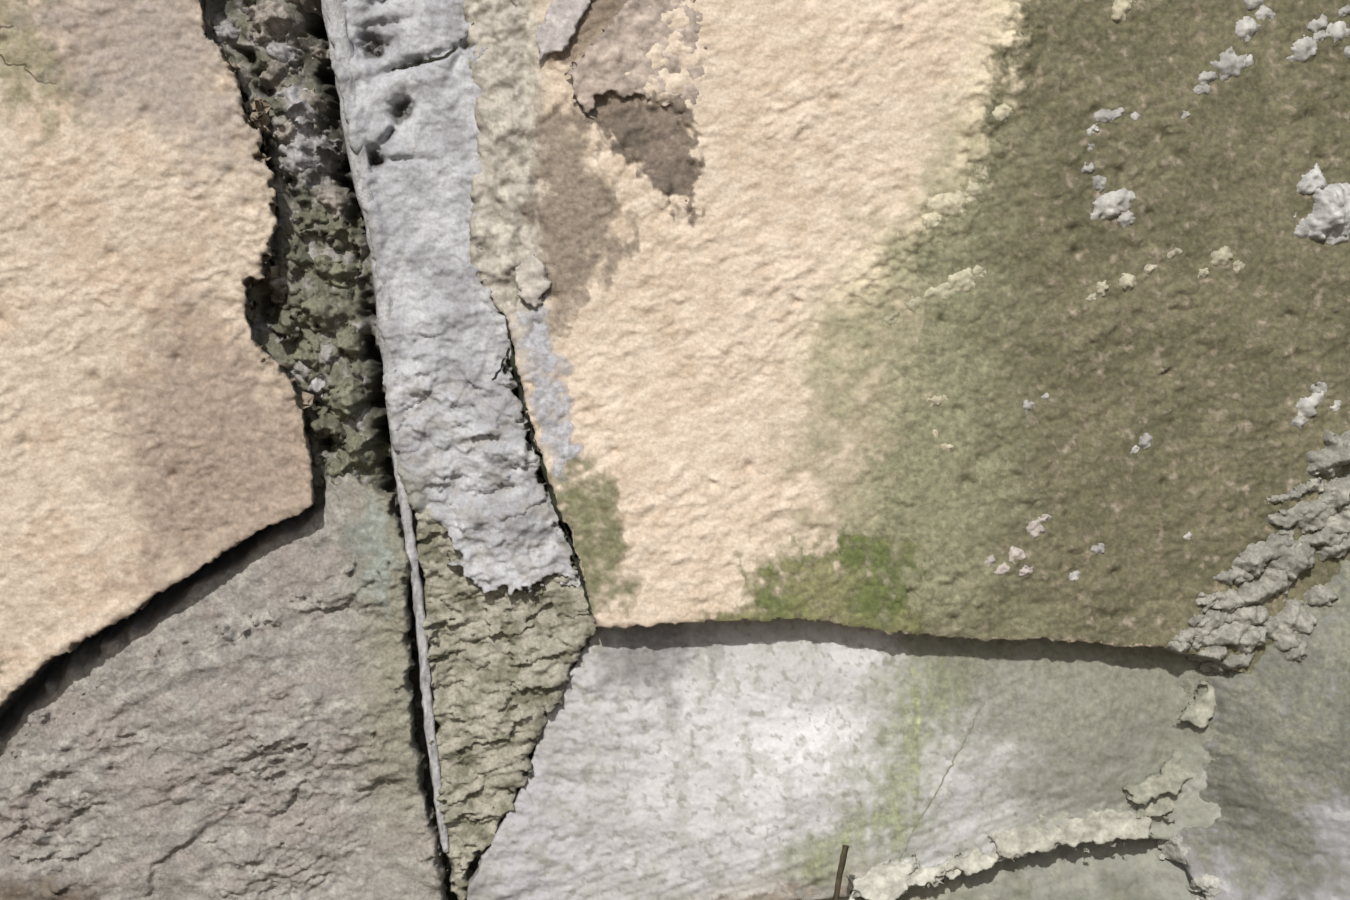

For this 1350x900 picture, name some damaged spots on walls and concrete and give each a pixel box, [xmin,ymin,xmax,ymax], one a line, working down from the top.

crack [0,25,57,84]
peeling [535,0,707,226]
efflorescence [1081,107,1140,228]
efflorescence [1193,0,1276,95]
efflorescence [1286,5,1350,63]
efflorescence [1294,163,1350,246]
peeling [515,254,552,310]
crack [200,0,480,900]
crack [492,318,593,615]
efflorescence [1291,382,1342,430]
spalling [0,466,448,900]
spalling [466,430,1350,900]